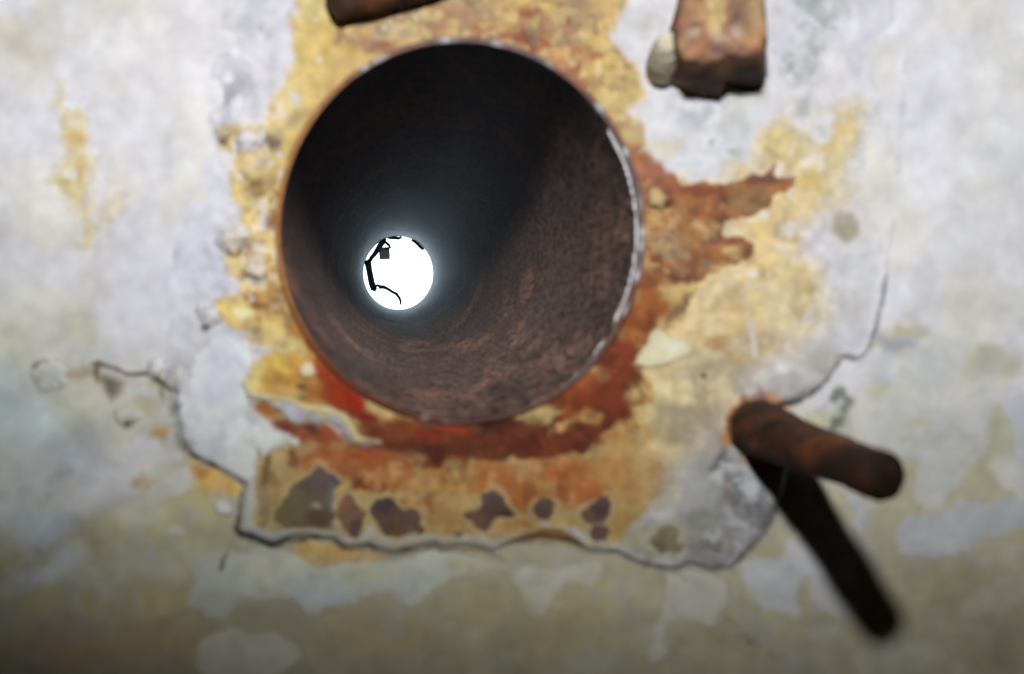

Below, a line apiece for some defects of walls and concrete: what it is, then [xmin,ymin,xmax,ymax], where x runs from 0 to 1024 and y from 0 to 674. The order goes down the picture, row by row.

peeling [145,333,383,508]
peeling [182,459,616,674]
crack [89,357,779,583]
corrosion [184,0,905,569]
peeling [632,326,694,369]
peeling [844,490,880,537]